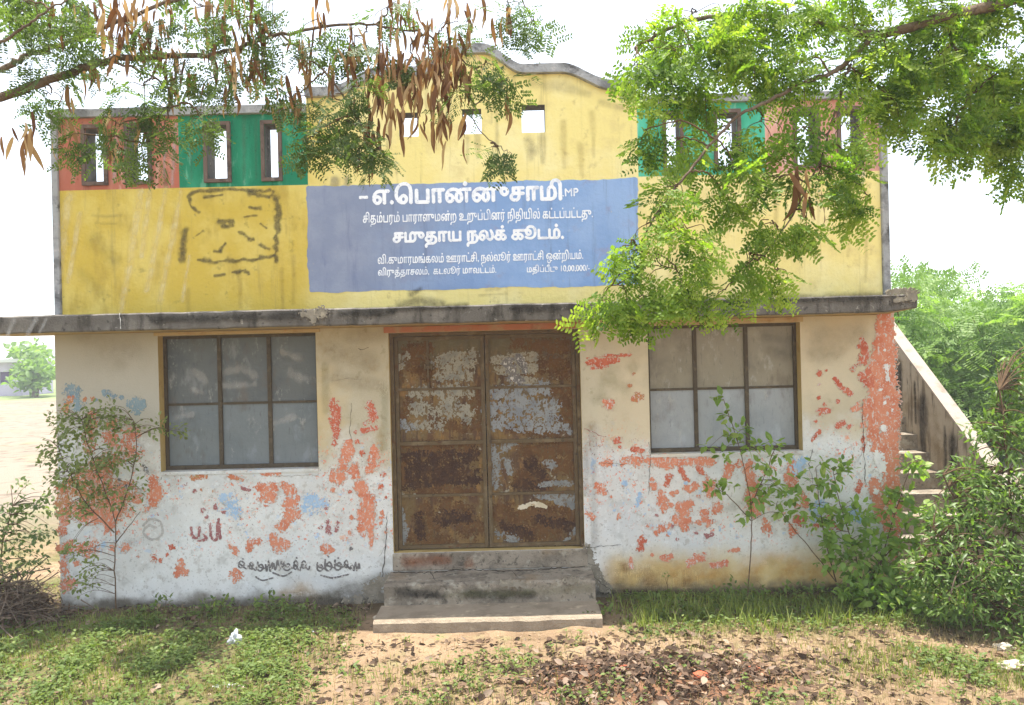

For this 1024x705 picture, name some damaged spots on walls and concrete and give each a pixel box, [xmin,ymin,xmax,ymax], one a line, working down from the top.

peeling [52,383,190,595]
peeling [184,397,388,584]
rust [399,337,578,547]
peeling [585,353,632,370]
peeling [599,436,772,570]
peeling [783,455,840,538]
peeling [811,286,920,561]
leakage [914,382,926,452]
leakage [944,433,956,492]
spalling [341,572,389,604]